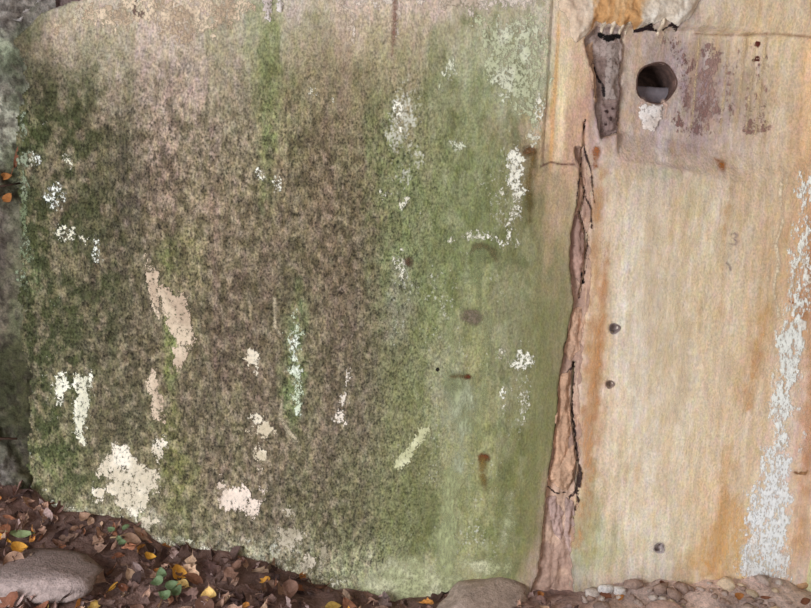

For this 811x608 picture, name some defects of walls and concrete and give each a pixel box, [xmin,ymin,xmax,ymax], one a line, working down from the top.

spalling [584,26,623,137]
peeling [92,434,216,550]
peeling [145,368,166,424]
peeling [143,253,197,372]
peeling [217,474,268,520]
efflorescence [273,298,304,416]
leakage [360,374,512,599]
rust [478,453,490,483]
leakage [497,349,535,371]
crack [547,361,582,519]
efflorescence [733,168,811,581]